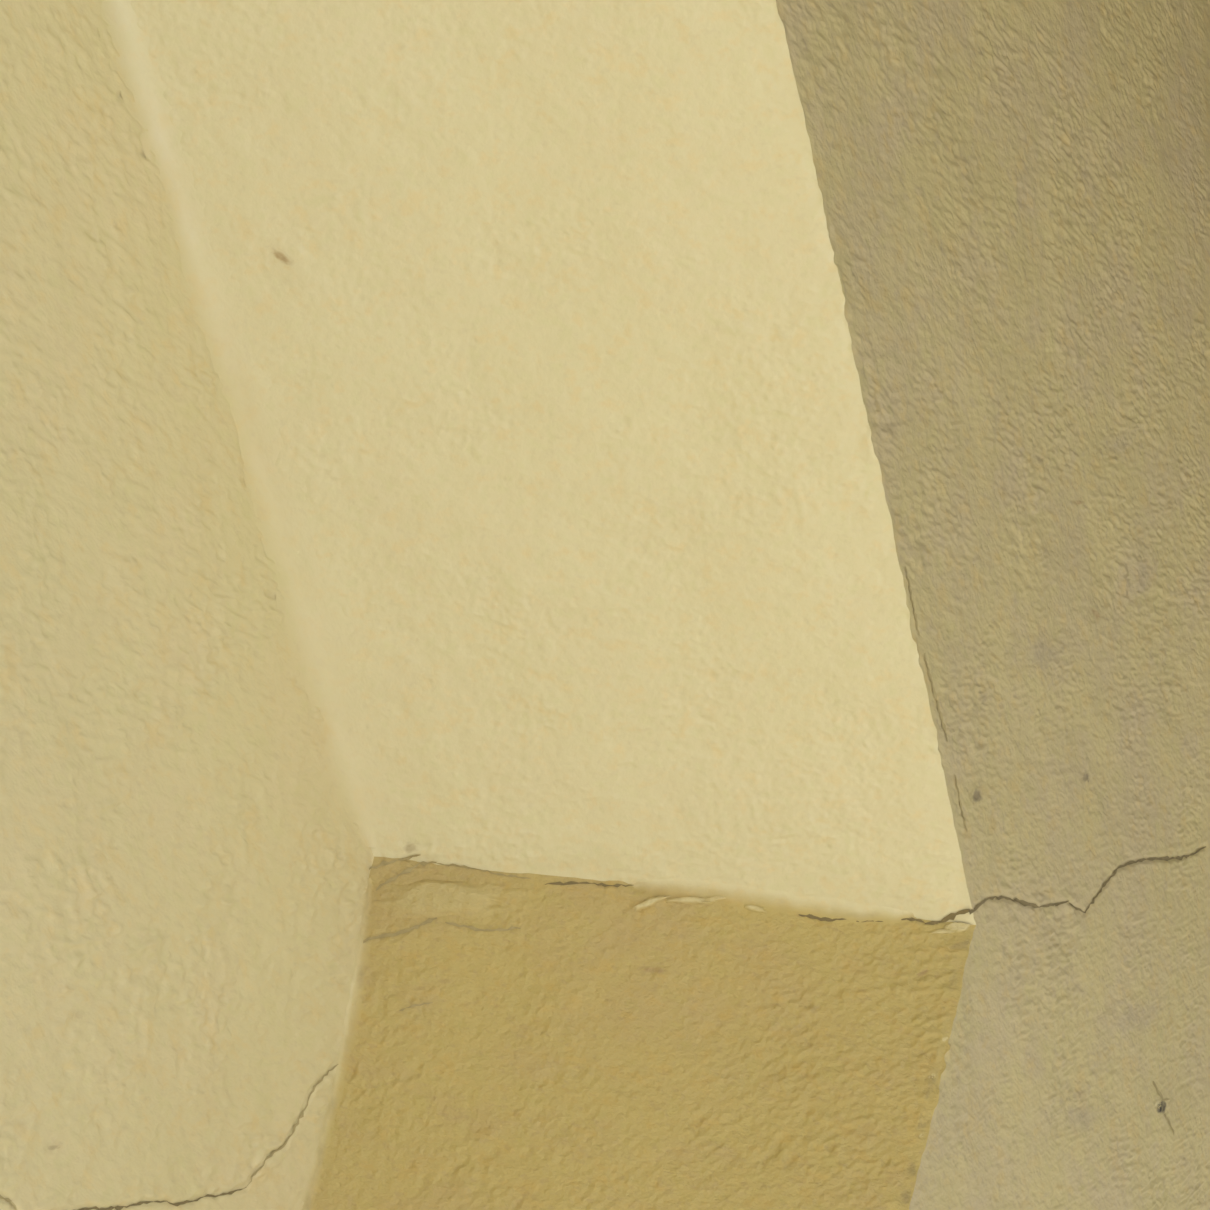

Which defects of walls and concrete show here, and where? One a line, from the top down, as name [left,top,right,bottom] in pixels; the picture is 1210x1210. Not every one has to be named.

crack [369,855,634,891]
crack [799,846,1206,925]
crack [78,1064,339,1210]
crack [0,1195,17,1210]